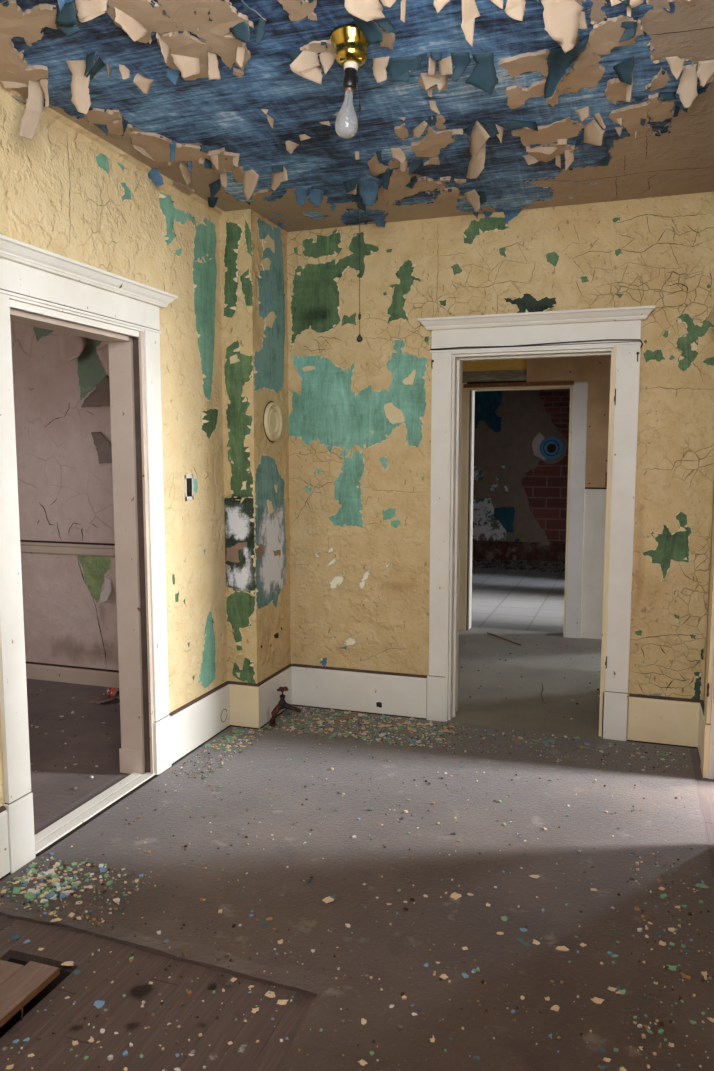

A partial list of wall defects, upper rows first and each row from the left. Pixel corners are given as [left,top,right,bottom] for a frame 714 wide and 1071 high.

peeling [0,0,714,688]
crack [436,230,535,311]
crack [563,132,714,308]
crack [37,498,107,667]
crack [630,634,701,697]
peeling [689,634,704,700]